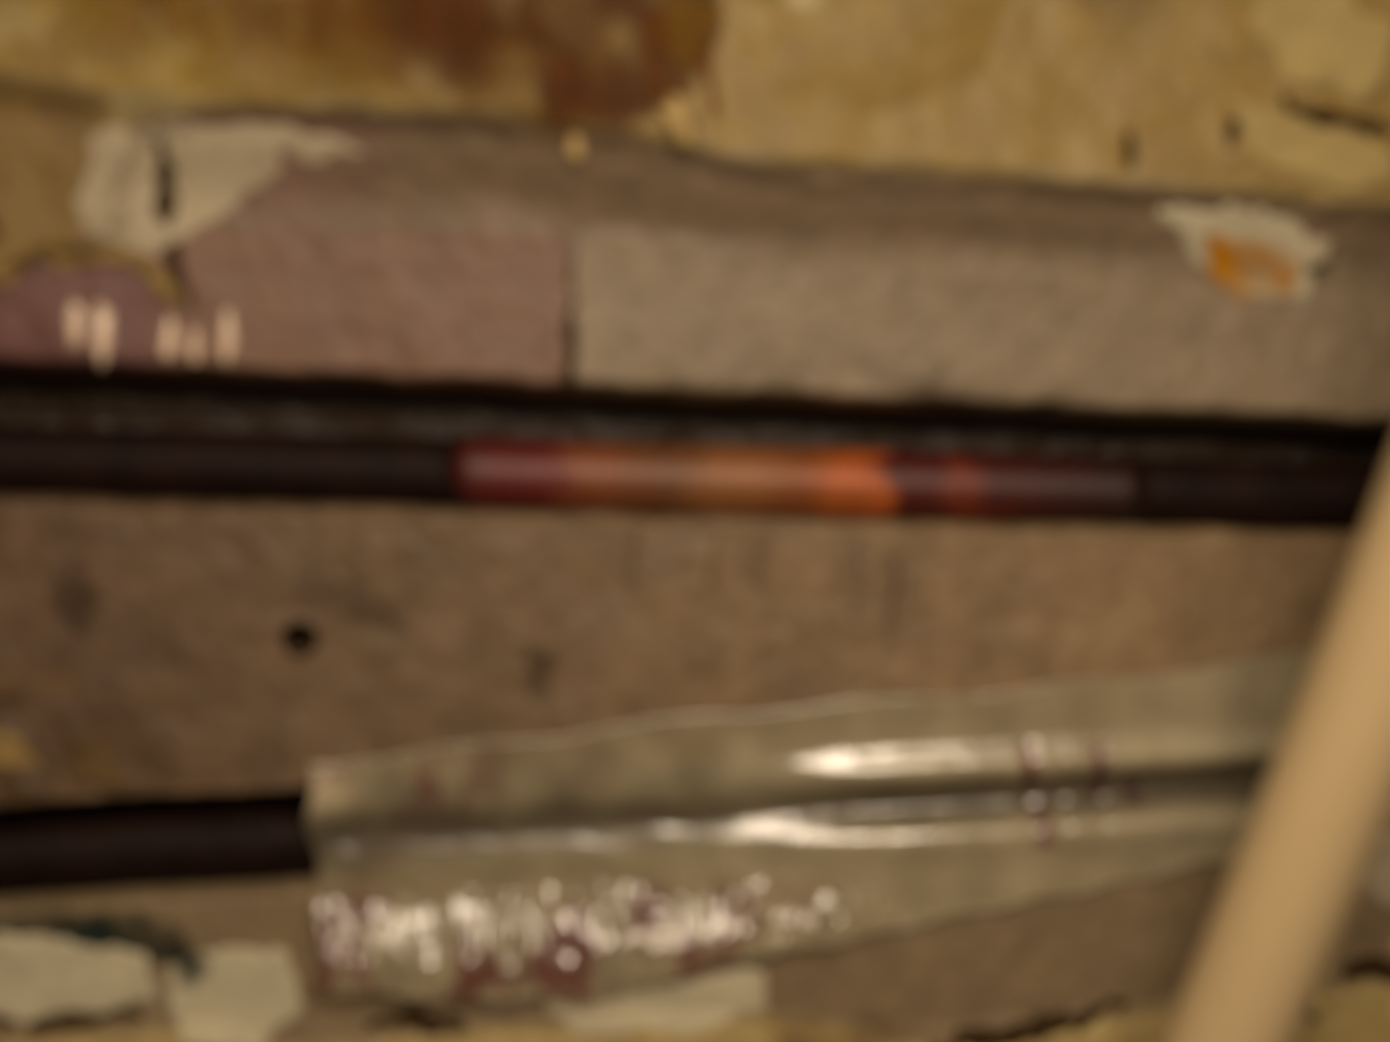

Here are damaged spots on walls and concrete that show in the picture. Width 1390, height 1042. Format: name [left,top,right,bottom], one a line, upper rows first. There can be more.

spalling [656,94,697,153]
peeling [74,119,365,257]
peeling [0,931,303,1042]
peeling [543,967,767,1037]